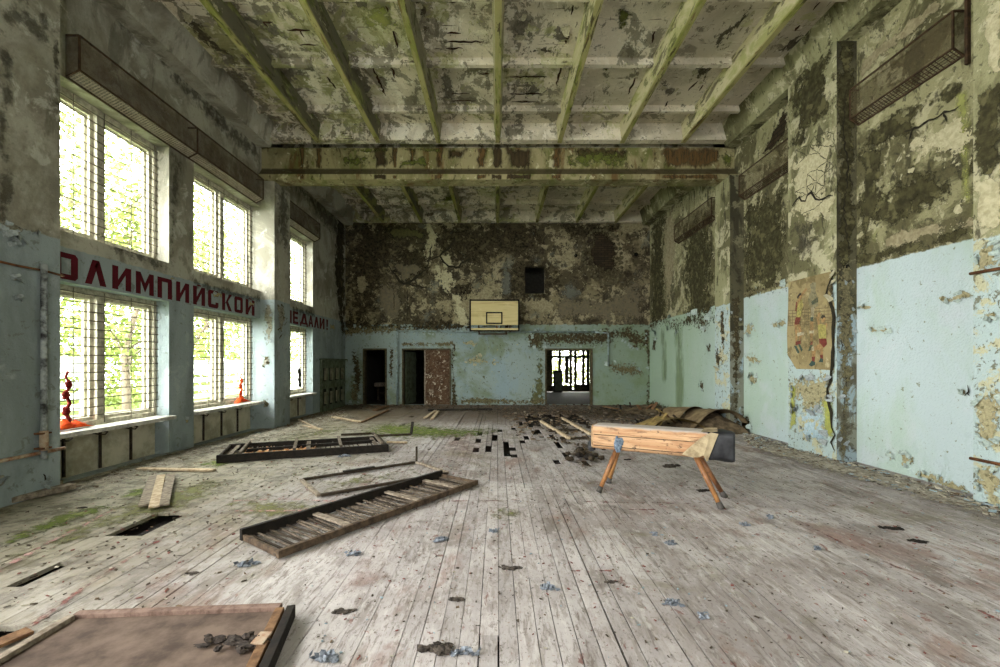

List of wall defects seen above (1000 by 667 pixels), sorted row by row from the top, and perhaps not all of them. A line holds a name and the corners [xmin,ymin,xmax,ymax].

damp [4,0,59,105]
corrosion [373,146,397,180]
corrosion [435,146,531,179]
corrosion [552,148,561,179]
damp [788,39,1000,266]
crack [904,105,961,139]
damp [278,188,561,334]
peeling [345,206,787,433]
damp [743,187,820,298]
crack [792,90,853,450]
flaking render [790,264,893,456]
peeling [957,388,1000,449]